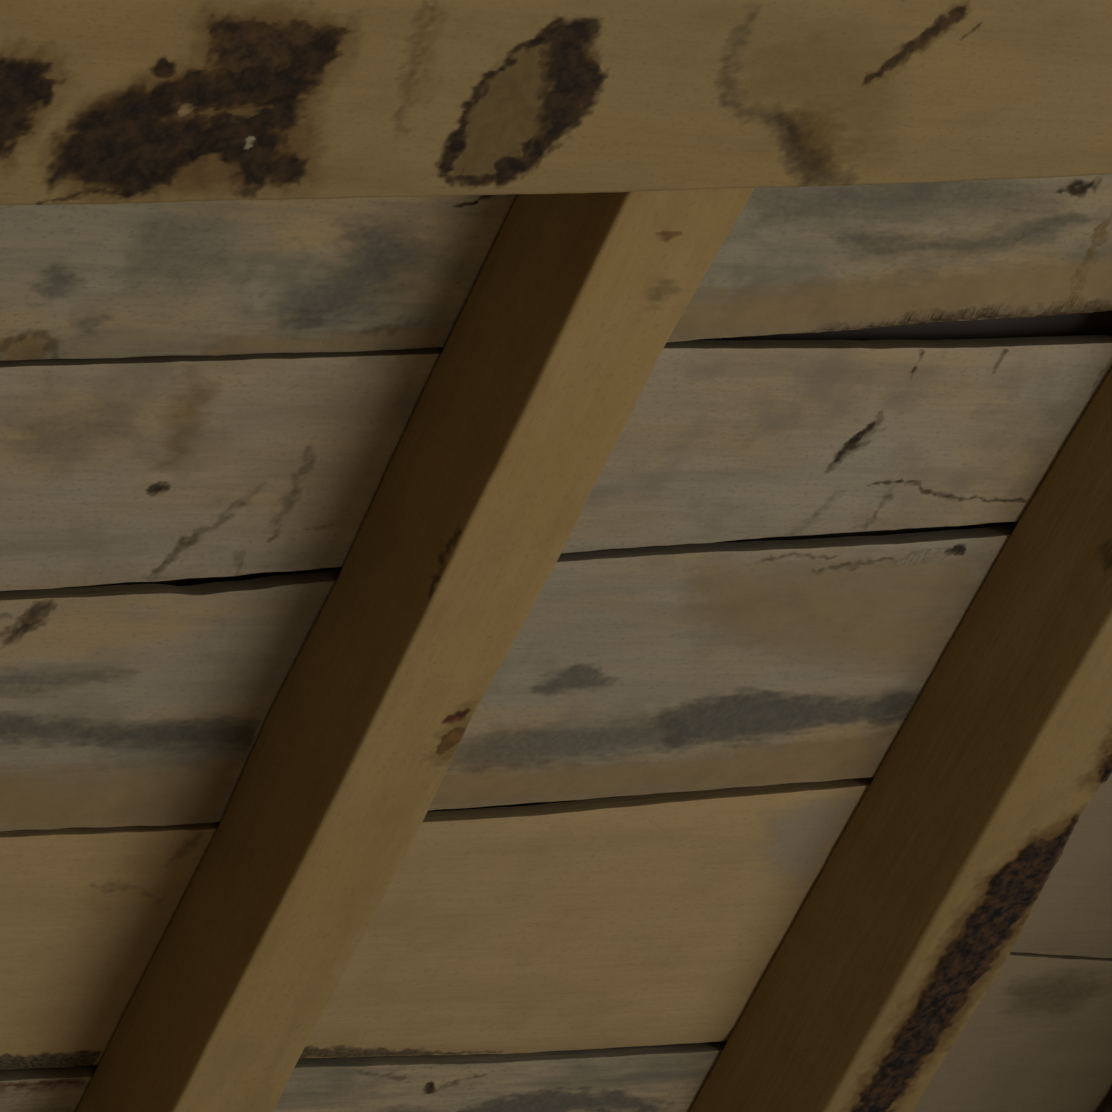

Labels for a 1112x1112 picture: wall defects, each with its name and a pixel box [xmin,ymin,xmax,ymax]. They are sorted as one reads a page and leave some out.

crack [830,423,875,467]
water stain [664,692,916,747]
water stain [458,1088,657,1112]